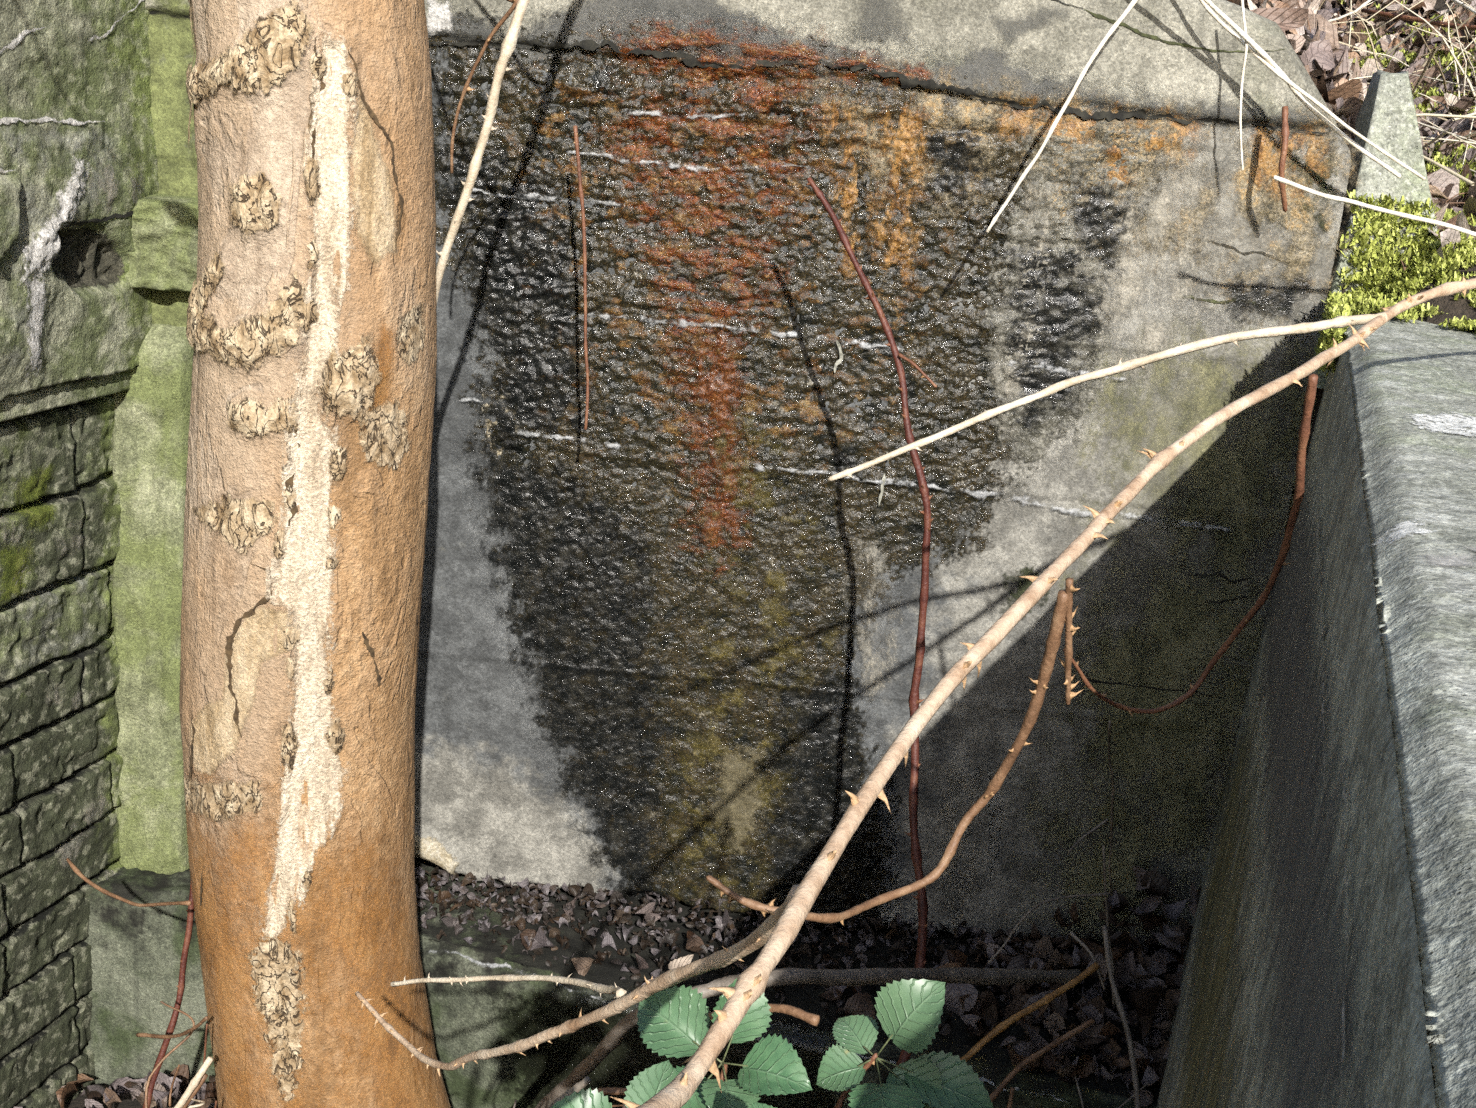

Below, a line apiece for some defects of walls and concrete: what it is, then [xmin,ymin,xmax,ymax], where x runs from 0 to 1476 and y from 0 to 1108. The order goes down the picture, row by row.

damp [427,0,1325,935]
corrosion [604,22,1356,575]
crack [1056,0,1286,53]